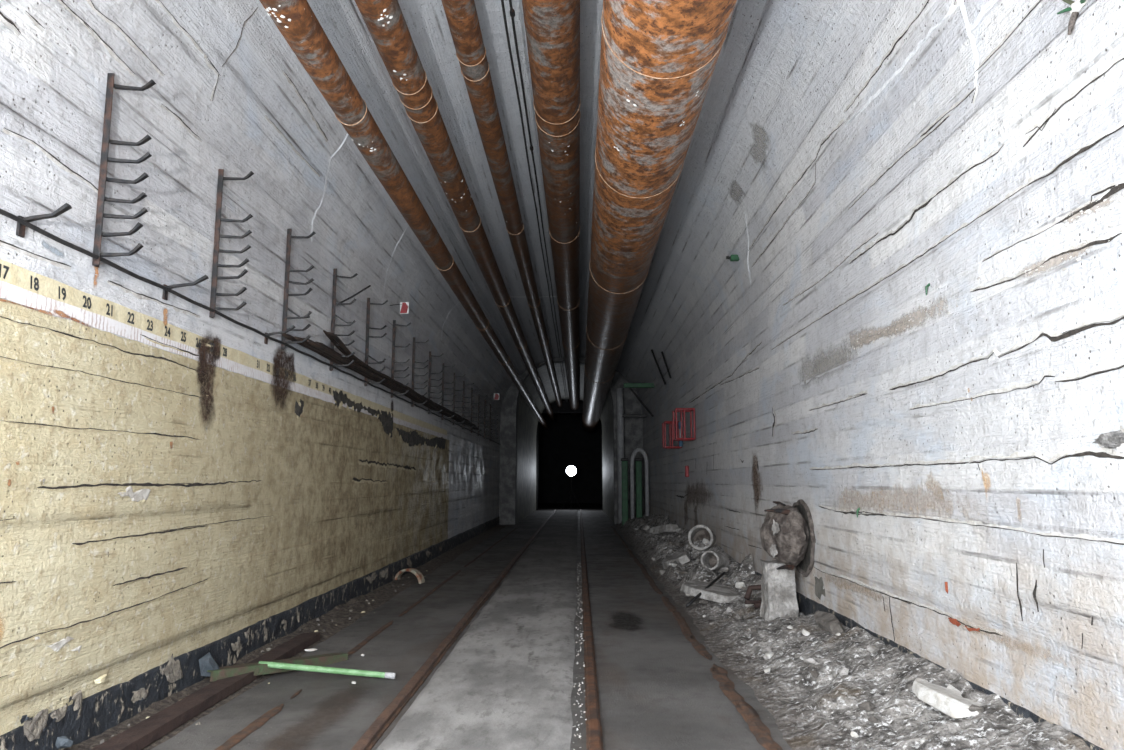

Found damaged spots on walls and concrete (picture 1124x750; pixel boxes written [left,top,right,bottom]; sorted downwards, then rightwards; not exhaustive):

crack [783,54,1124,305]
crack [689,121,1124,403]
water stain [198,337,220,422]
water stain [273,349,295,406]
crack [792,309,1124,434]
crack [36,480,262,492]
water stain [752,456,760,507]
crack [810,447,1124,470]
spalling [1092,425,1124,454]
peeling [163,654,183,684]
peeling [20,690,84,742]
peeling [131,688,148,706]